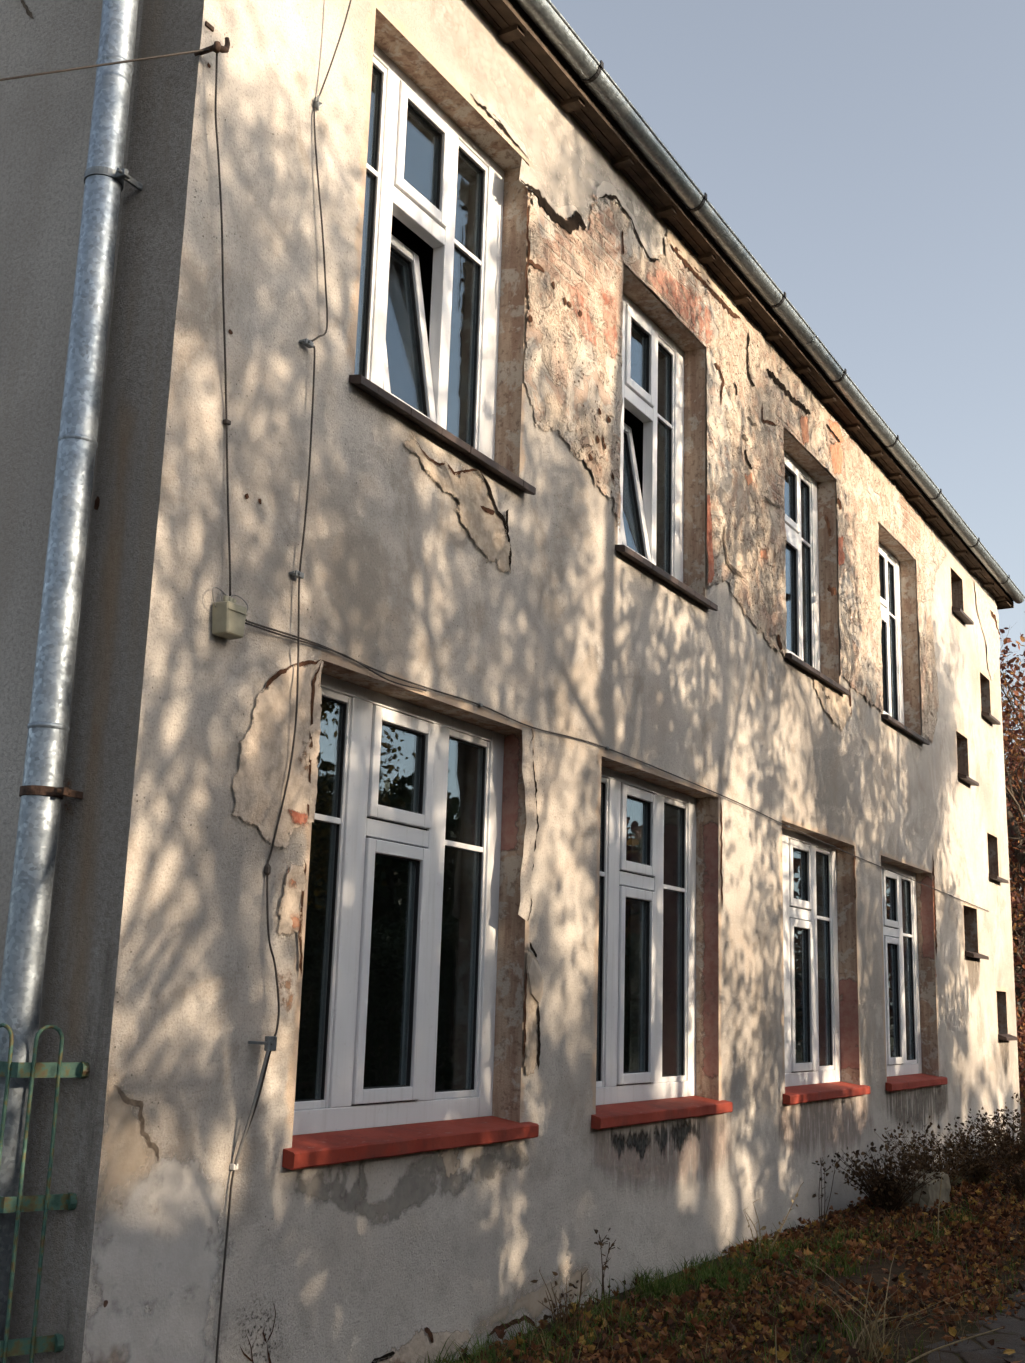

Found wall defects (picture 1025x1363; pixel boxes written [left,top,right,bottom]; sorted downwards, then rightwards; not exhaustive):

crack [21,0,34,19]
spalling [405,427,519,577]
spalling [524,192,946,743]
spalling [232,644,324,848]
spalling [277,860,307,974]